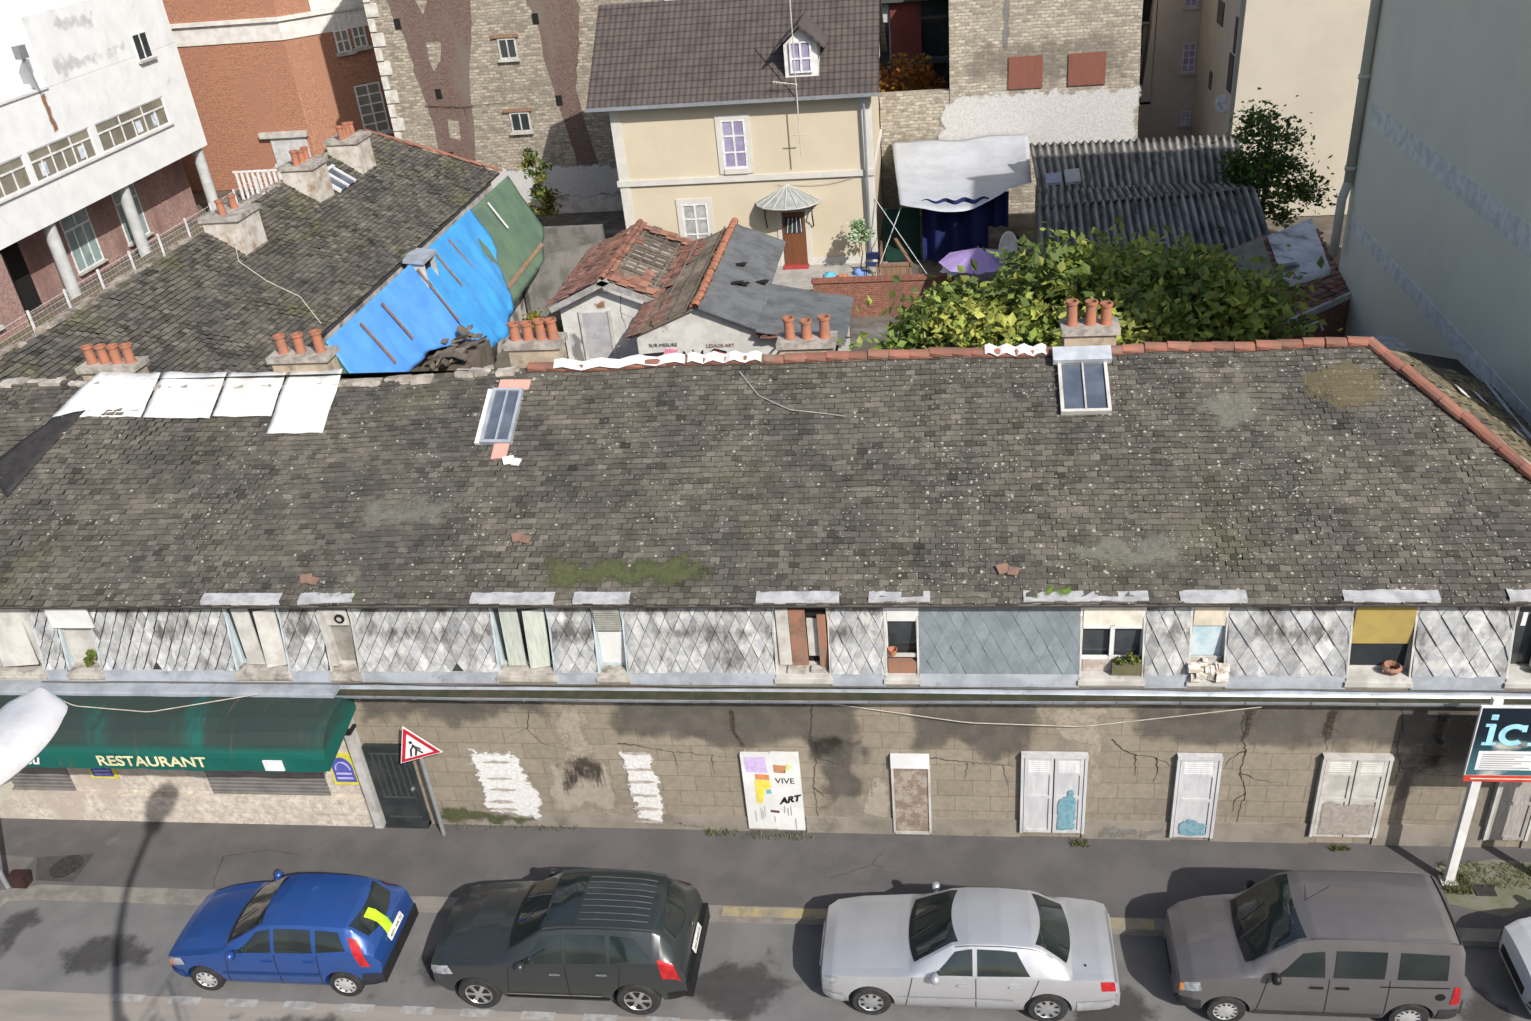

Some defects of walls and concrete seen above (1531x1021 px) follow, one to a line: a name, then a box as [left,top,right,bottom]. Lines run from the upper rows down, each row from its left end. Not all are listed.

damp [555,707,601,790]
damp [624,768,659,811]
crack [1224,706,1278,820]